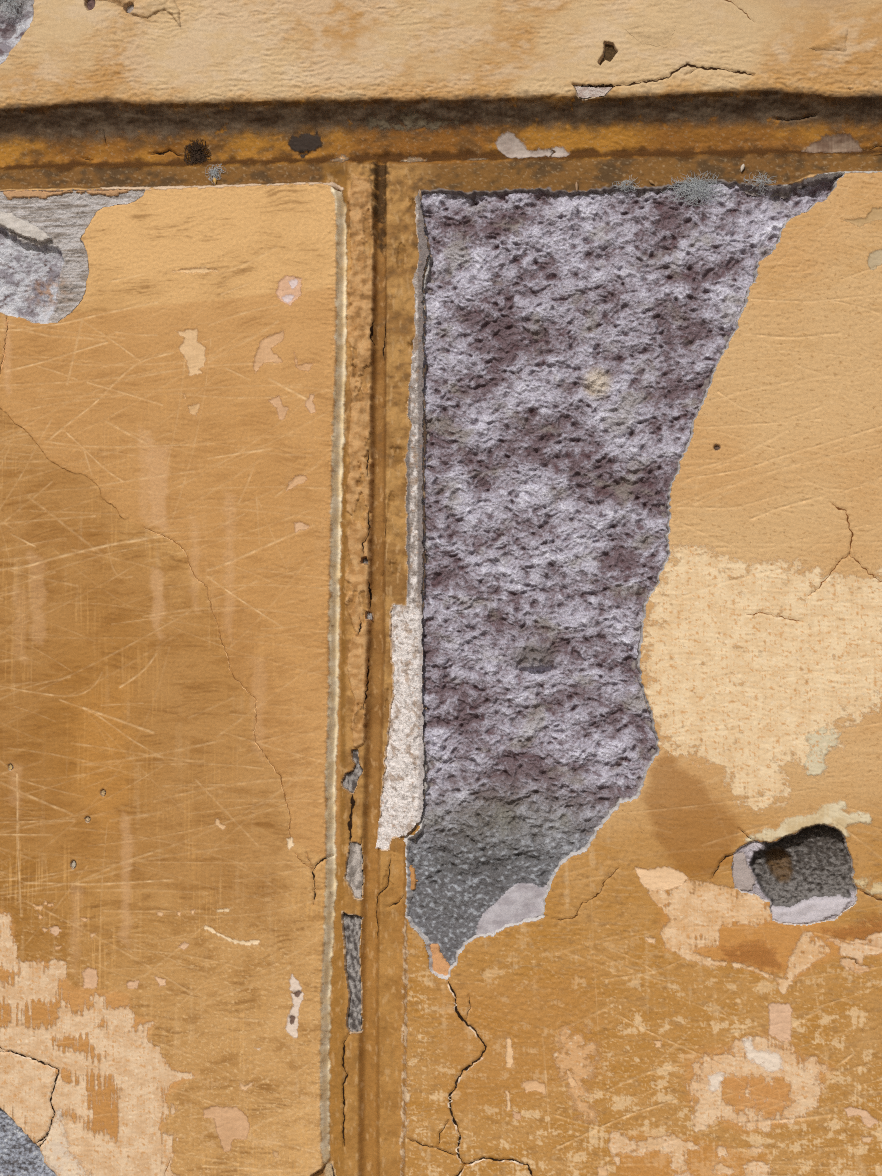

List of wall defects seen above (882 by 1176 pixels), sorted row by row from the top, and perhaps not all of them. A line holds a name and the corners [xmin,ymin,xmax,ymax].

spalling [0,0,34,64]
crack [574,63,753,88]
spalling [0,189,146,324]
spalling [341,173,882,980]
crack [748,503,882,621]
crack [142,527,362,905]
peeling [0,900,194,1176]
spalling [341,911,364,1034]
crack [410,981,533,1176]